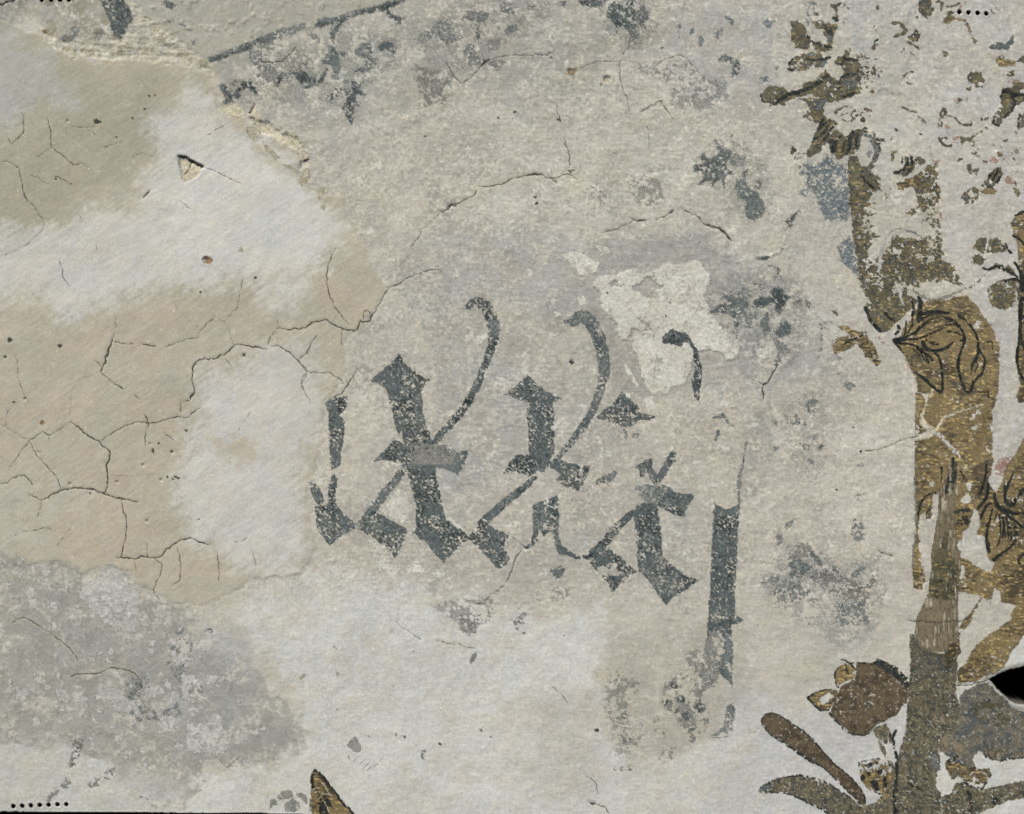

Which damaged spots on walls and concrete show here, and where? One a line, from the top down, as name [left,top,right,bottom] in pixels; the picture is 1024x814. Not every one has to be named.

flaking render [46,25,209,69]
crack [7,113,88,246]
crack [179,155,239,183]
flaking render [221,103,310,185]
peeling [560,244,769,411]
crack [0,257,442,599]
hole [990,666,1024,699]
leakage [48,741,82,802]